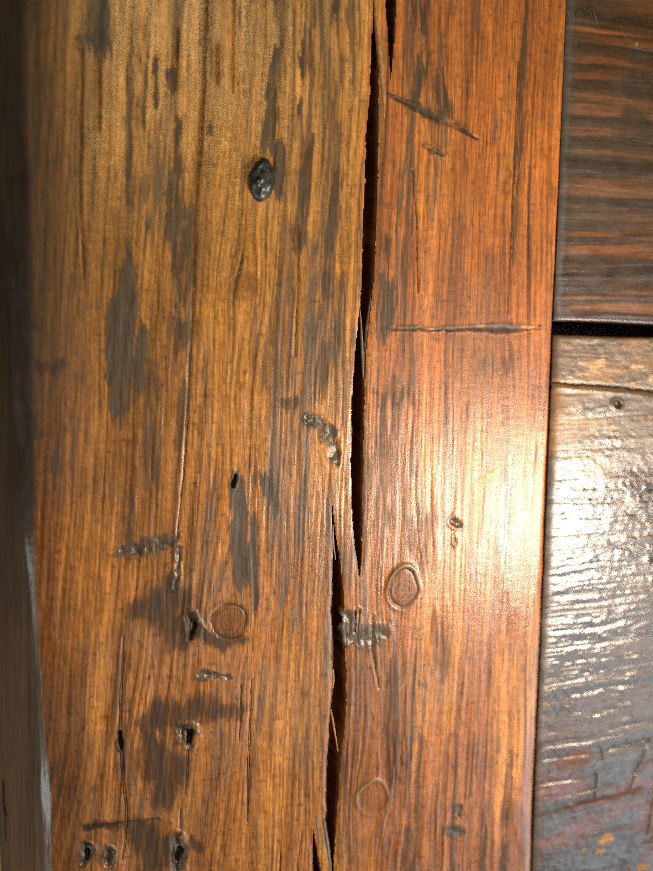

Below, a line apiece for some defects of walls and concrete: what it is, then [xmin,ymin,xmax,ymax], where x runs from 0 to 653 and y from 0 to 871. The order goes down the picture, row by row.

crack [279,0,396,871]
crack [508,62,519,310]